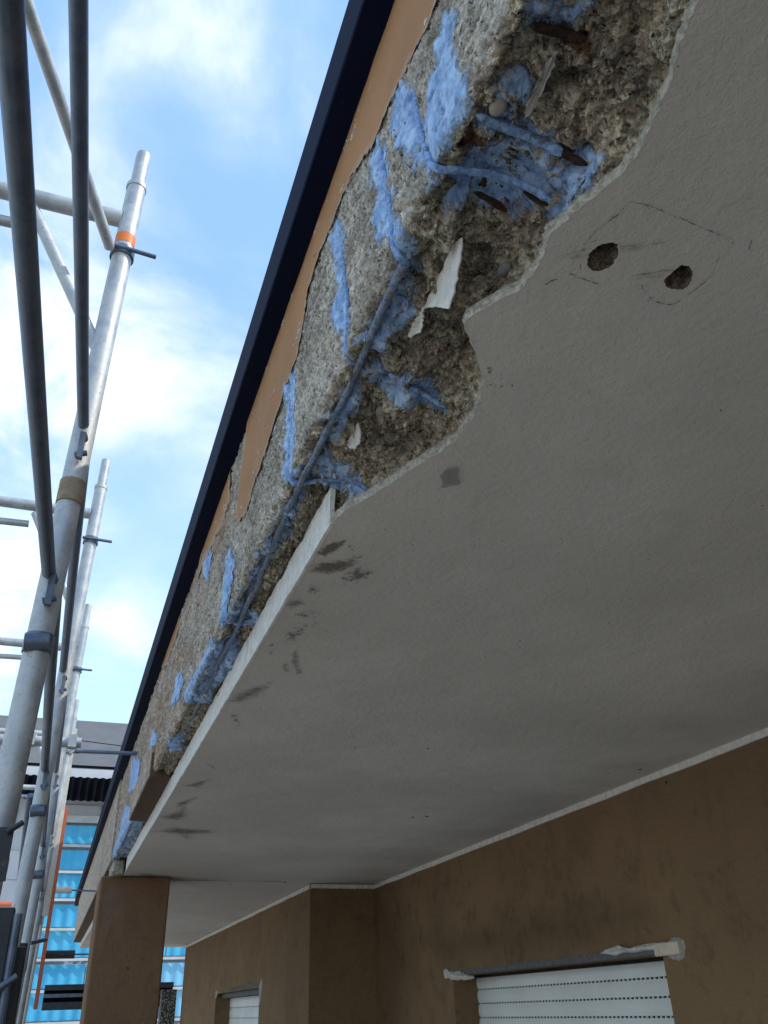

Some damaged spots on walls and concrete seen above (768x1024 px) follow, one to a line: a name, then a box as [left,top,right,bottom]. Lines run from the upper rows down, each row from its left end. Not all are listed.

corrosion [456,123,486,148]
spalling [113,0,698,861]
damp [313,541,371,582]